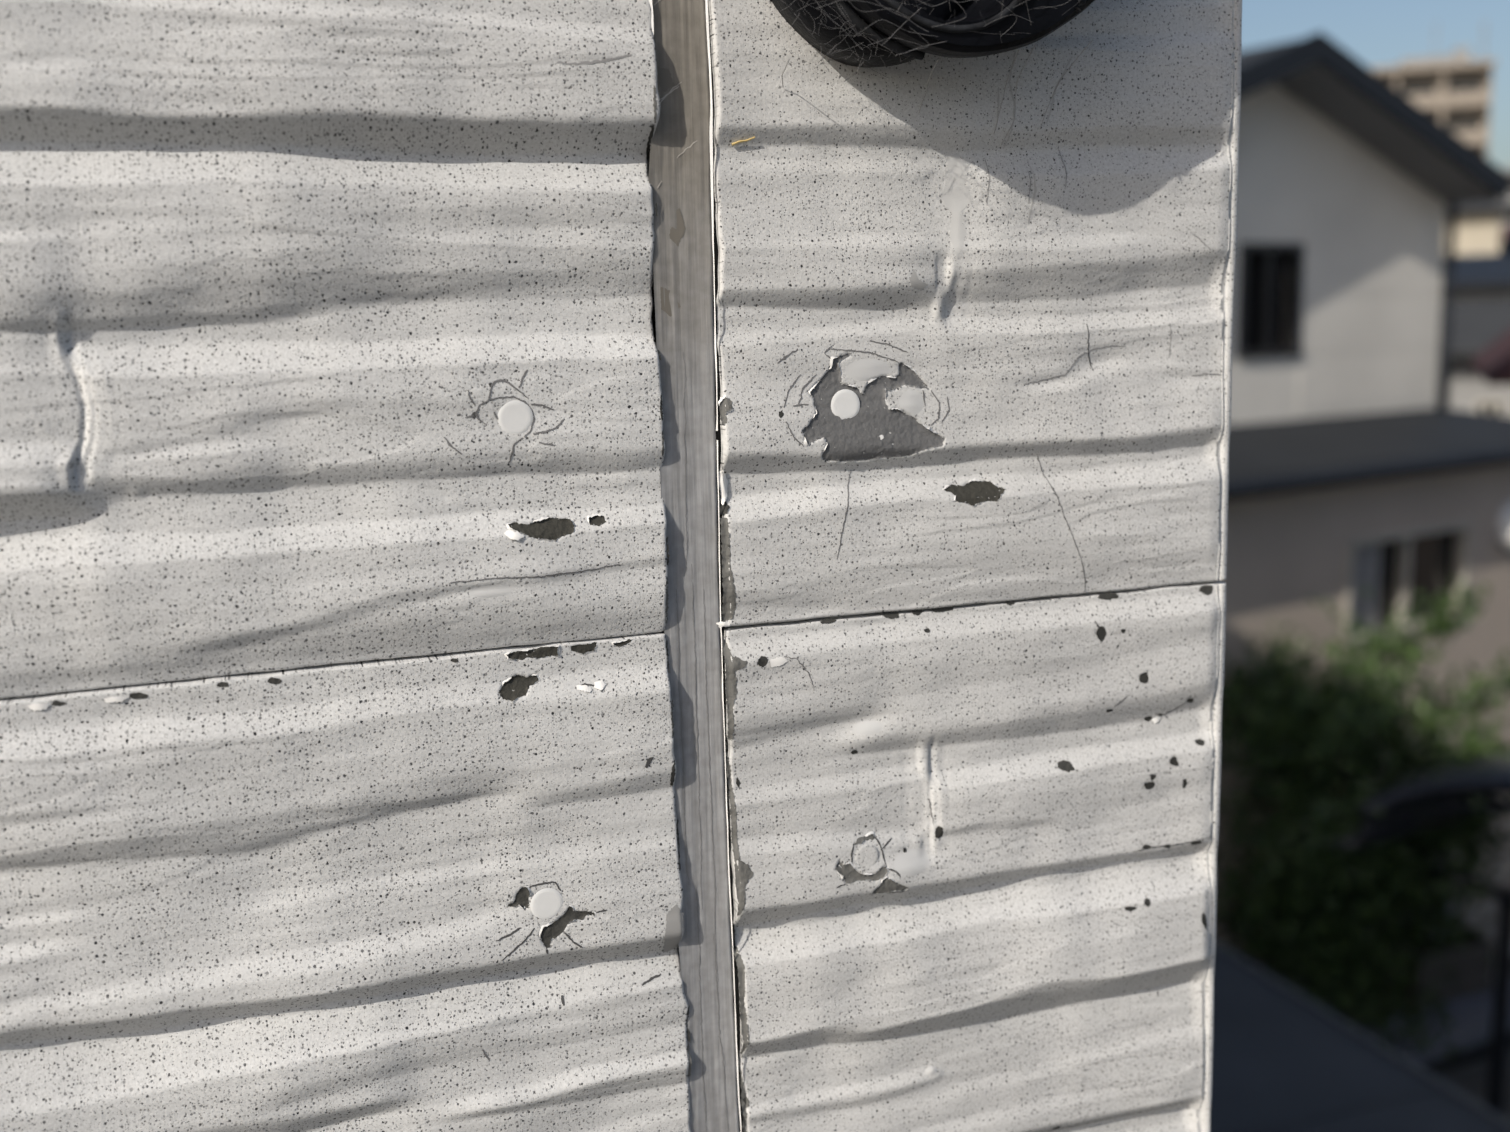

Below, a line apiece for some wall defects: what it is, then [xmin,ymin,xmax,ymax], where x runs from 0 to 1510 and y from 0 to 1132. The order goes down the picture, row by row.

crack [444,370,565,464]
peeling [803,353,945,462]
peeling [944,481,1005,506]
peeling [504,515,606,541]
peeling [1098,592,1118,600]
peeling [1096,626,1126,642]
peeling [499,639,632,701]
peeling [1058,760,1075,772]
peeling [835,860,908,894]
peeling [508,887,530,908]
peeling [540,906,595,949]